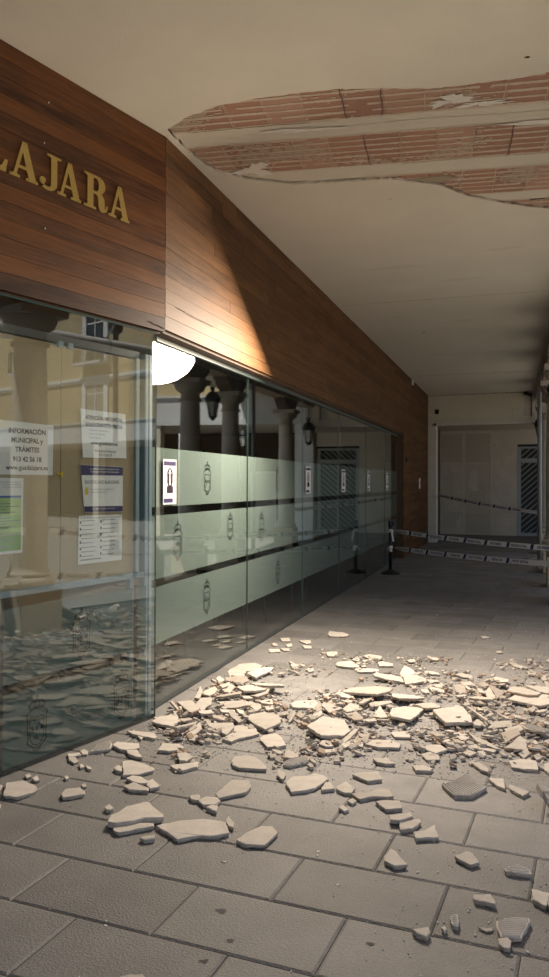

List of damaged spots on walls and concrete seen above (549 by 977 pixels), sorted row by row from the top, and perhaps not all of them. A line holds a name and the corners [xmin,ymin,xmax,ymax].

spalling [167,72,549,209]